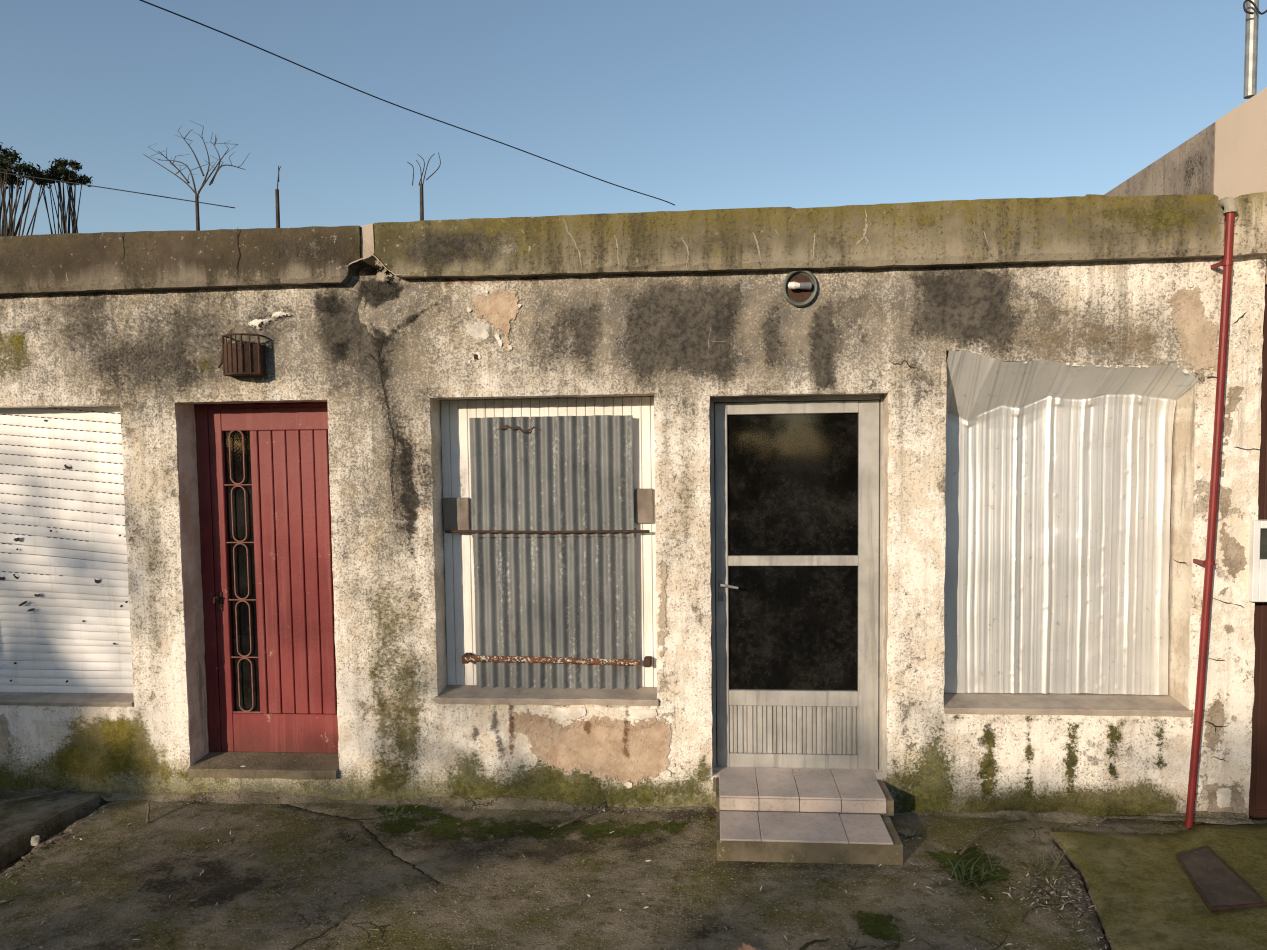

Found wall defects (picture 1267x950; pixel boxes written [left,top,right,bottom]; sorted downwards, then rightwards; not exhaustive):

peeling [466,288,521,351]
leakage [761,301,787,366]
leakage [808,298,845,391]
peeling [1166,283,1219,384]
leakage [0,279,436,574]
peeling [1218,386,1247,595]
leakage [100,717,136,774]
peeling [509,707,675,788]
leakage [976,715,1057,813]
leakage [1049,719,1080,796]
leakage [1099,720,1138,779]
leakage [1153,718,1178,768]